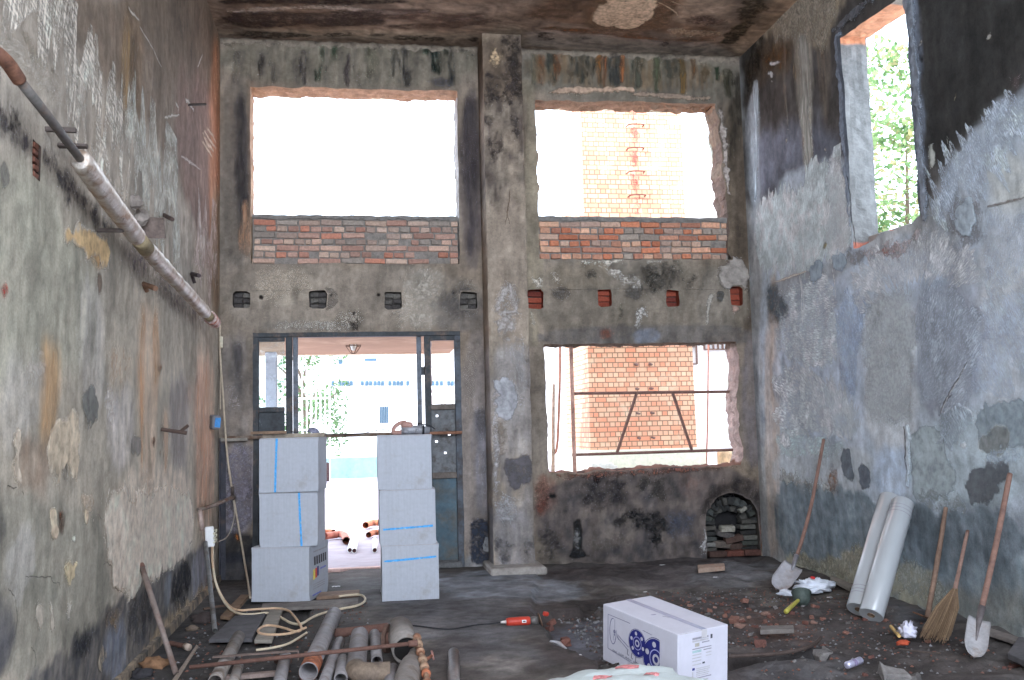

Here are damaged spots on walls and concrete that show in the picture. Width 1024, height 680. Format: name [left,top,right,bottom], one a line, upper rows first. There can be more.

damp [609,55,677,92]
flaking render [494,377,517,420]
flaking render [48,410,80,481]
flaking render [51,509,59,538]
flaking render [85,486,194,600]